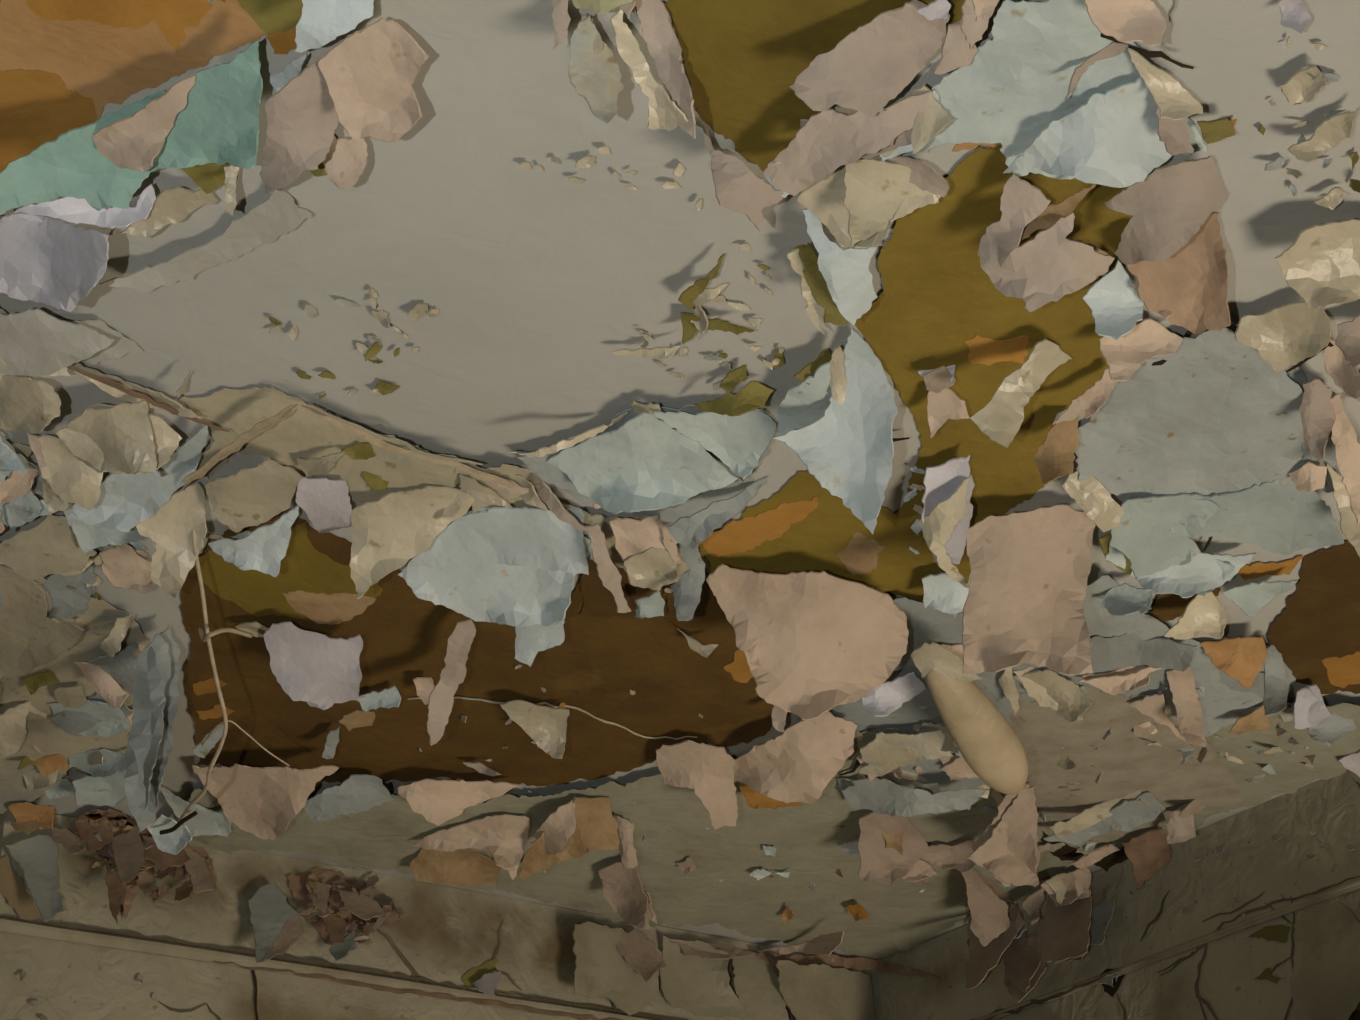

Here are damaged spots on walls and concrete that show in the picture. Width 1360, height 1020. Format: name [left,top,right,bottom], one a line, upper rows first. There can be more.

peeling [0,0,429,312]
peeling [475,0,1360,947]
peeling [0,308,990,963]
peeling [462,958,501,996]
spalling [1098,968,1125,997]
crack [1140,890,1169,942]
crack [1156,876,1360,1020]